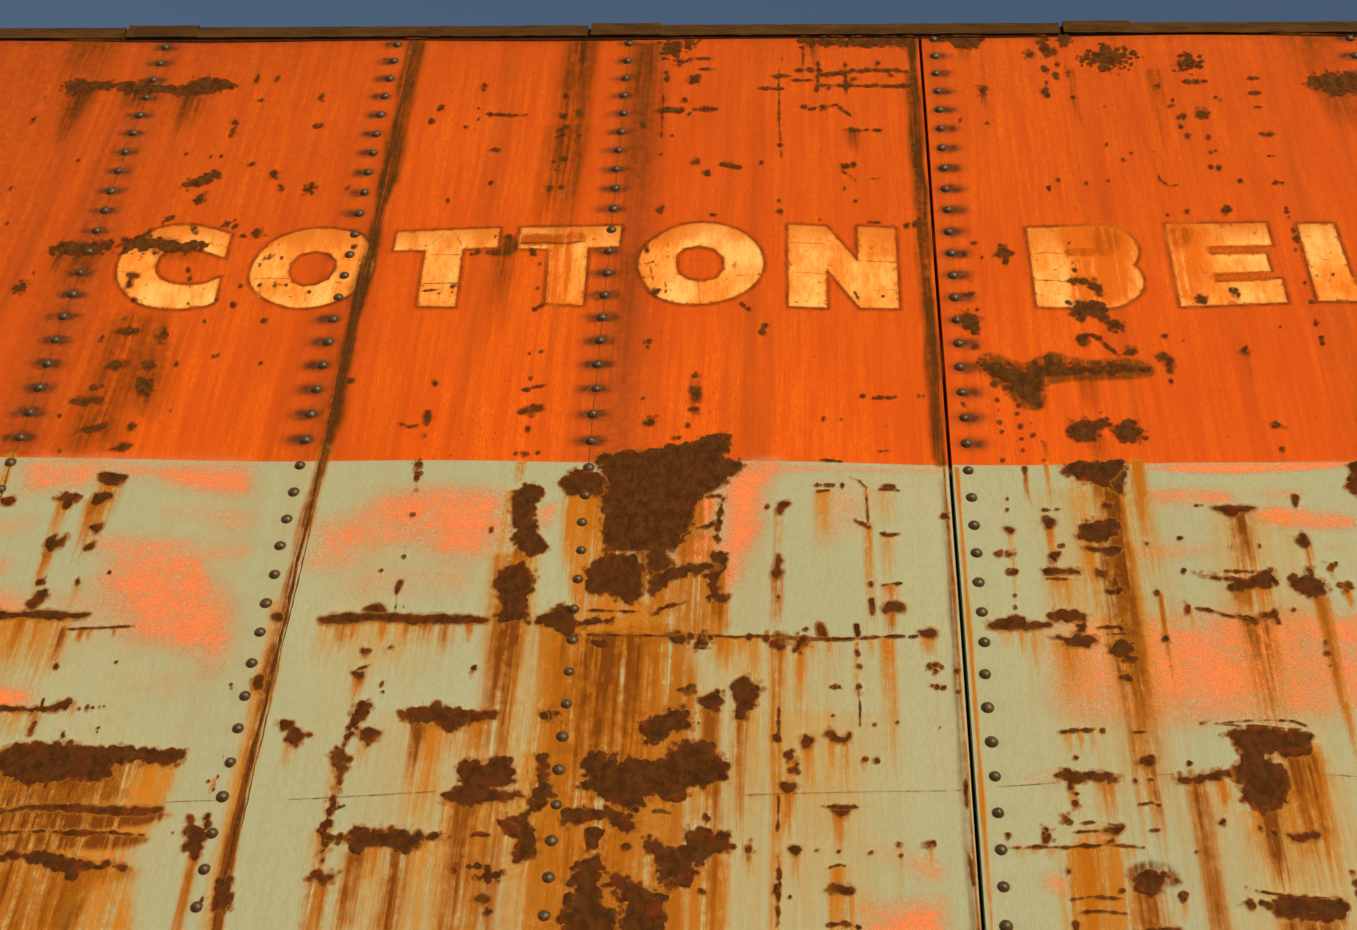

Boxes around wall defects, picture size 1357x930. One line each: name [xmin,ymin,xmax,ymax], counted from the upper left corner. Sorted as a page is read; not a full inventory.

corrosion [59,76,239,125]
corrosion [1172,51,1207,84]
corrosion [49,215,209,281]
corrosion [57,317,169,453]
corrosion [0,453,16,506]
corrosion [172,37,424,930]
corrosion [303,34,1189,930]
corrosion [1343,461,1357,495]
corrosion [0,471,135,670]
corrosion [1181,504,1355,744]
corrosion [0,698,186,930]
corrosion [1243,869,1357,930]